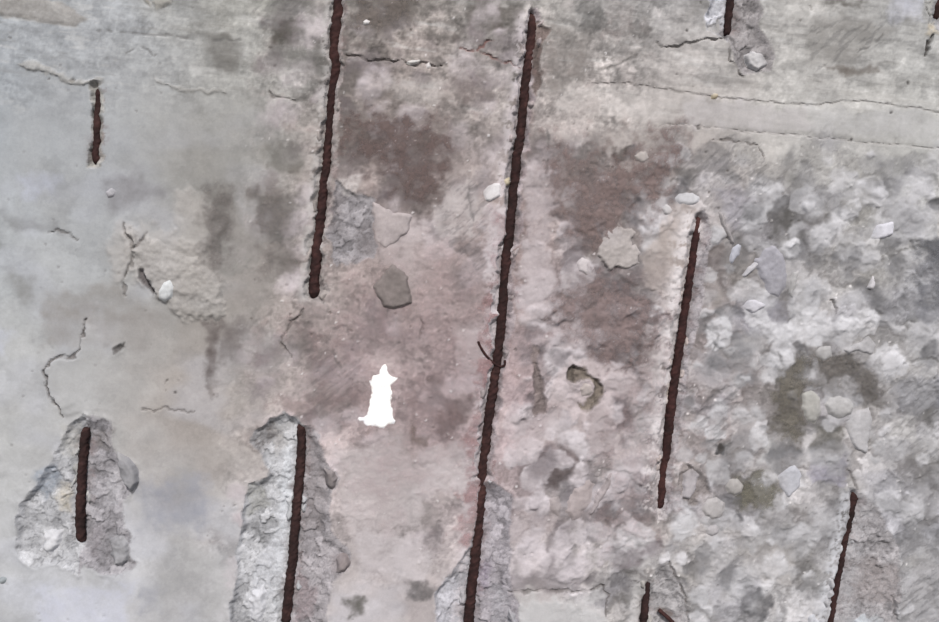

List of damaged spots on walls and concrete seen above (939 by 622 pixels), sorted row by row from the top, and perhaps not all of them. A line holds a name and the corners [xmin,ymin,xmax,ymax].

flaking render [138,268,173,302]
spalling [434,6,553,622]
peeling [577,223,640,275]
peeling [870,222,894,239]
crack [42,318,88,417]
spalling [566,364,605,413]
spalling [653,193,744,536]
peeling [801,390,872,453]
spalling [14,413,141,577]
spalling [228,410,353,622]
spalling [638,561,690,622]
spalling [808,487,904,622]